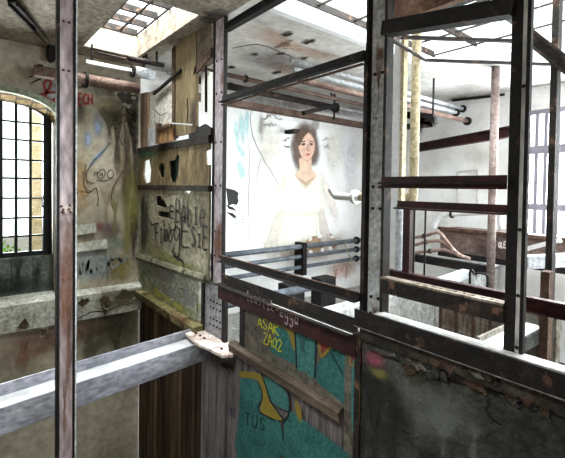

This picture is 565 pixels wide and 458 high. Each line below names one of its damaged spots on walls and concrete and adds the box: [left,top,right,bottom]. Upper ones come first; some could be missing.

damp [104,93,148,257]
spalling [99,288,141,310]
spalling [15,316,30,331]
corrosion [434,313,492,338]